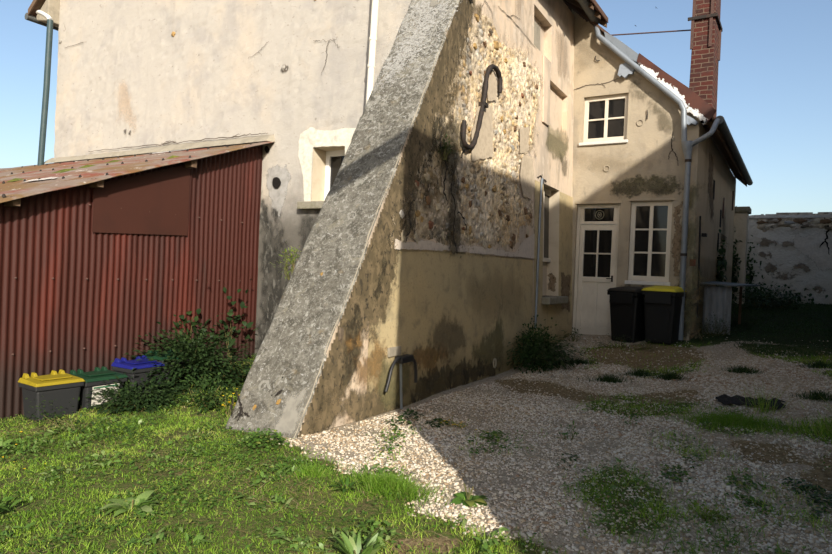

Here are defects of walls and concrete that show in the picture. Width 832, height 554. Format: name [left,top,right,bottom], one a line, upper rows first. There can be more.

crack [88,133,267,152]
leakage [297,0,500,438]
spalling [394,14,542,259]